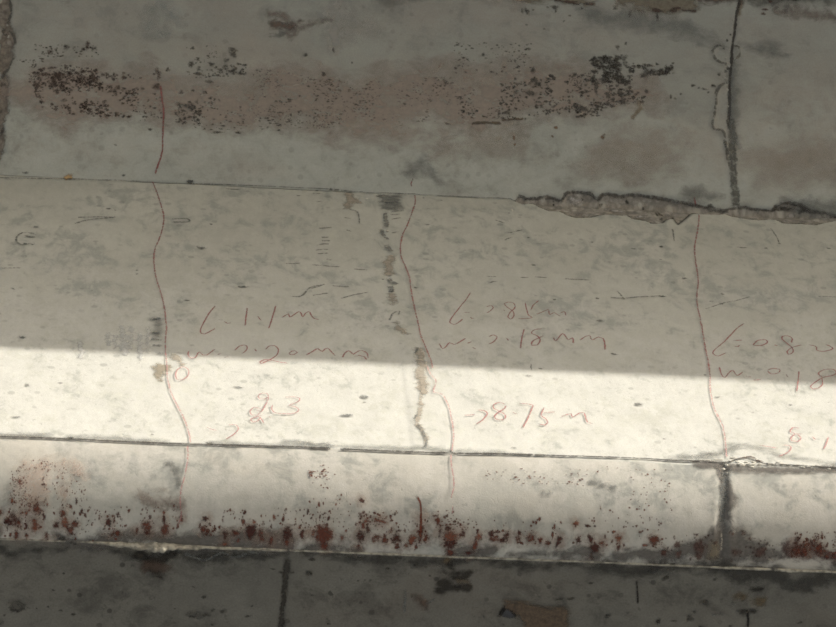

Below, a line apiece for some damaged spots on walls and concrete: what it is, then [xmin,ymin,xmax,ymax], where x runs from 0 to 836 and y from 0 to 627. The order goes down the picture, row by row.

spalling [0,0,16,159]
damp [22,41,168,121]
damp [174,45,391,134]
damp [396,42,674,126]
spalling [516,191,836,225]
crack [152,87,191,525]
crack [400,181,455,513]
crack [694,199,727,457]
corrosion [0,459,185,542]
corrosion [199,465,562,607]
corrosion [572,469,718,560]
corrosion [729,531,836,566]